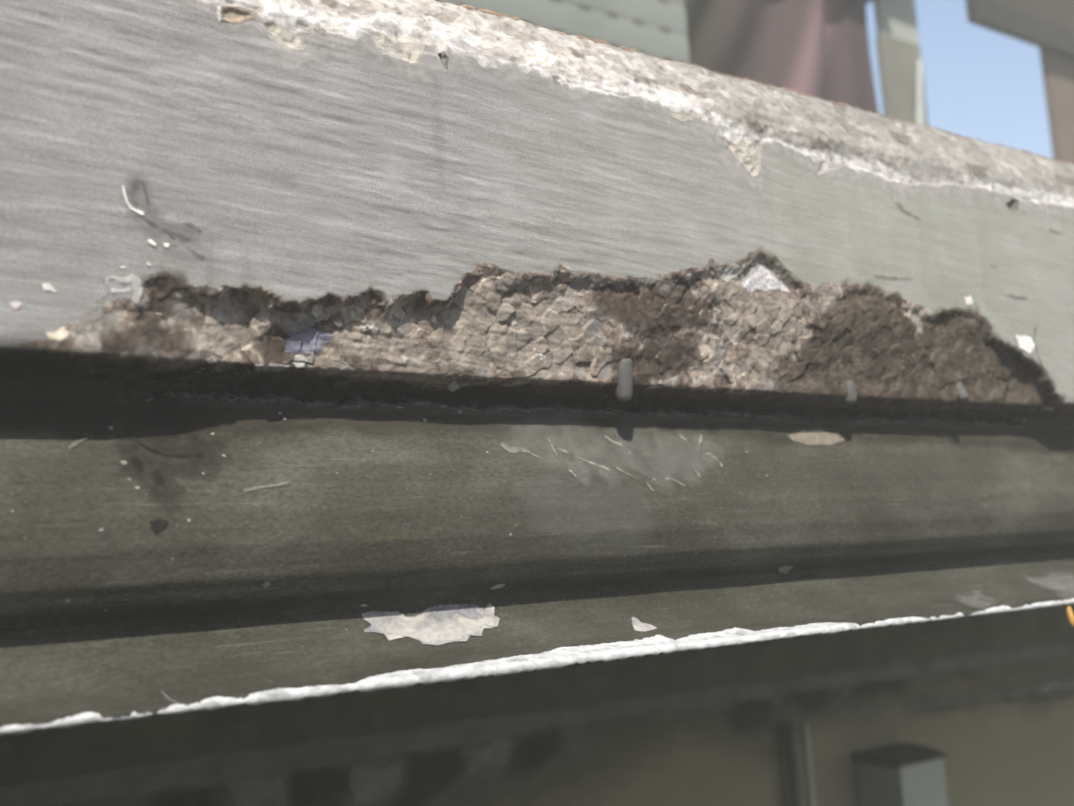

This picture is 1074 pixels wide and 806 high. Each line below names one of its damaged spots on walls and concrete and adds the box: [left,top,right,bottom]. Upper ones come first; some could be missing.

spalling [197,0,1074,210]
spalling [122,185,144,215]
spalling [20,249,1061,427]
spalling [0,598,1074,735]
leakage [0,604,1074,806]